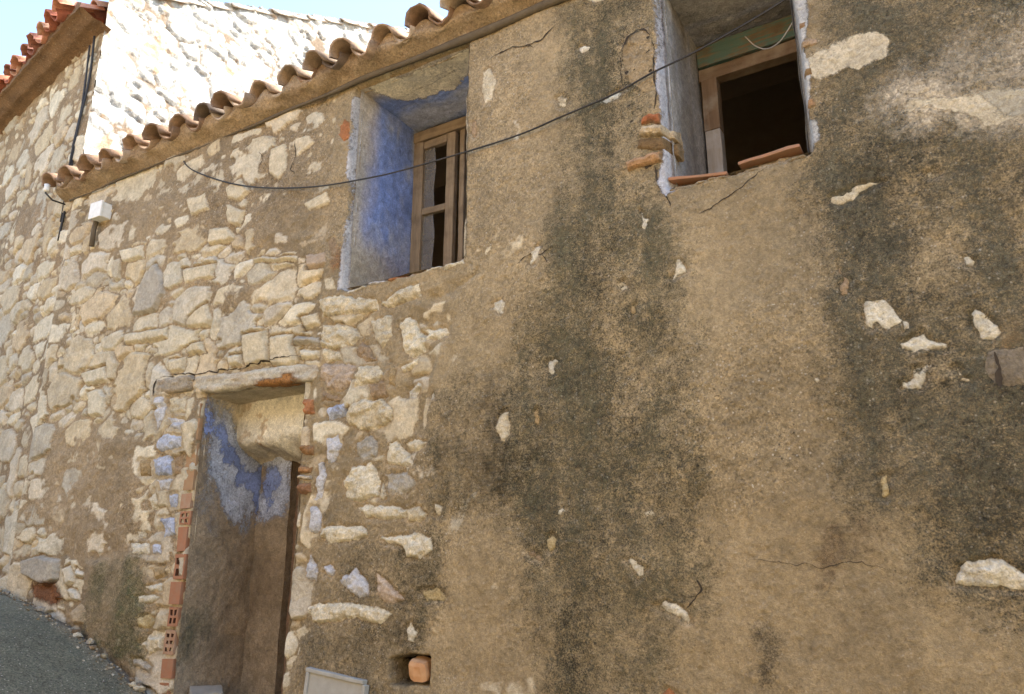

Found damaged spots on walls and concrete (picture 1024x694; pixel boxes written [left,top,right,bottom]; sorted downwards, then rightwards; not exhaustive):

crack [402,27,553,97]
peeling [792,0,889,152]
crack [701,167,767,213]
crack [153,354,302,396]
spalling [309,97,449,560]
leakage [427,0,717,694]
spalling [863,299,947,353]
leakage [789,0,1024,618]
spalling [971,309,1002,341]
peeling [201,397,292,533]
spalling [306,555,405,625]
spalling [955,558,1024,591]